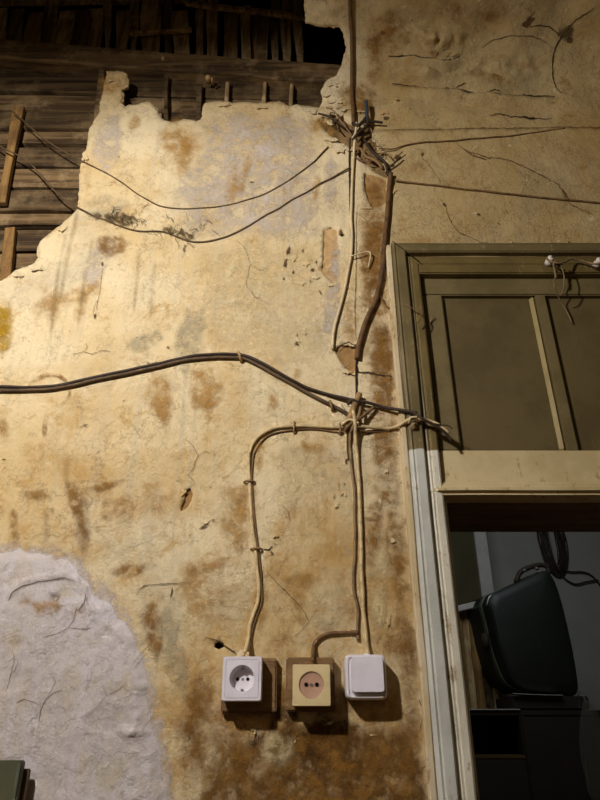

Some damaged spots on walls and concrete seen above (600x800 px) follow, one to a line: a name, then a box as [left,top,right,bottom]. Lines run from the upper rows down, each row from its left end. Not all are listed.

crack [388,47,460,73]
crack [482,8,594,93]
peeling [179,80,399,233]
crack [372,113,600,243]
leakage [99,237,124,254]
flaking render [283,228,344,332]
leakage [362,185,395,465]
flaking render [180,488,193,511]
leakage [366,491,406,599]
crack [8,578,94,638]
crack [7,650,61,722]
leakage [183,679,425,800]